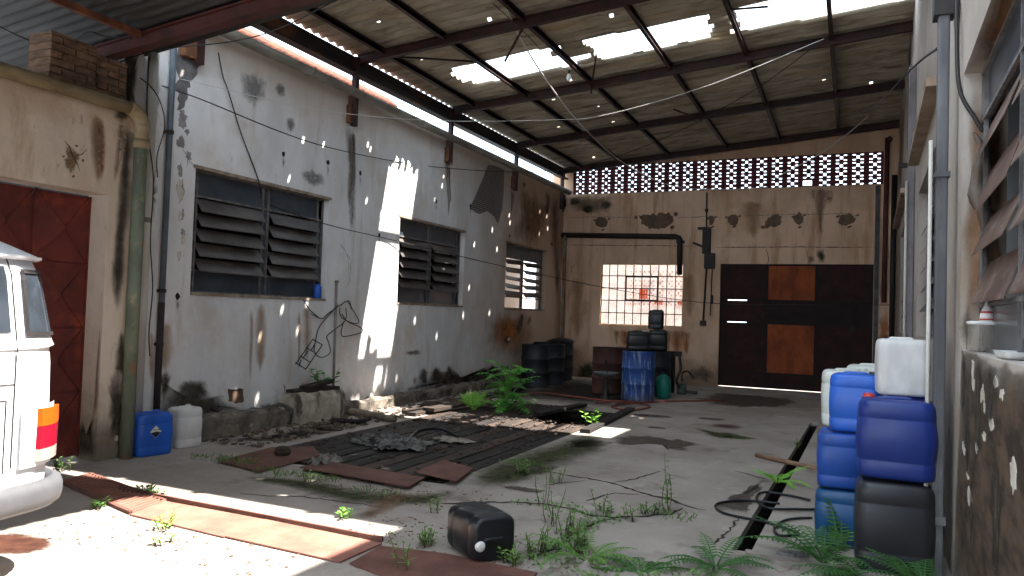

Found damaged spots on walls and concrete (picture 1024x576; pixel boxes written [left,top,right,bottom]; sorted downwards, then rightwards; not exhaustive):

peeling [175,48,199,261]
leakage [113,111,131,296]
mould [161,374,234,414]
peeling [962,360,1004,456]
crack [419,468,703,559]